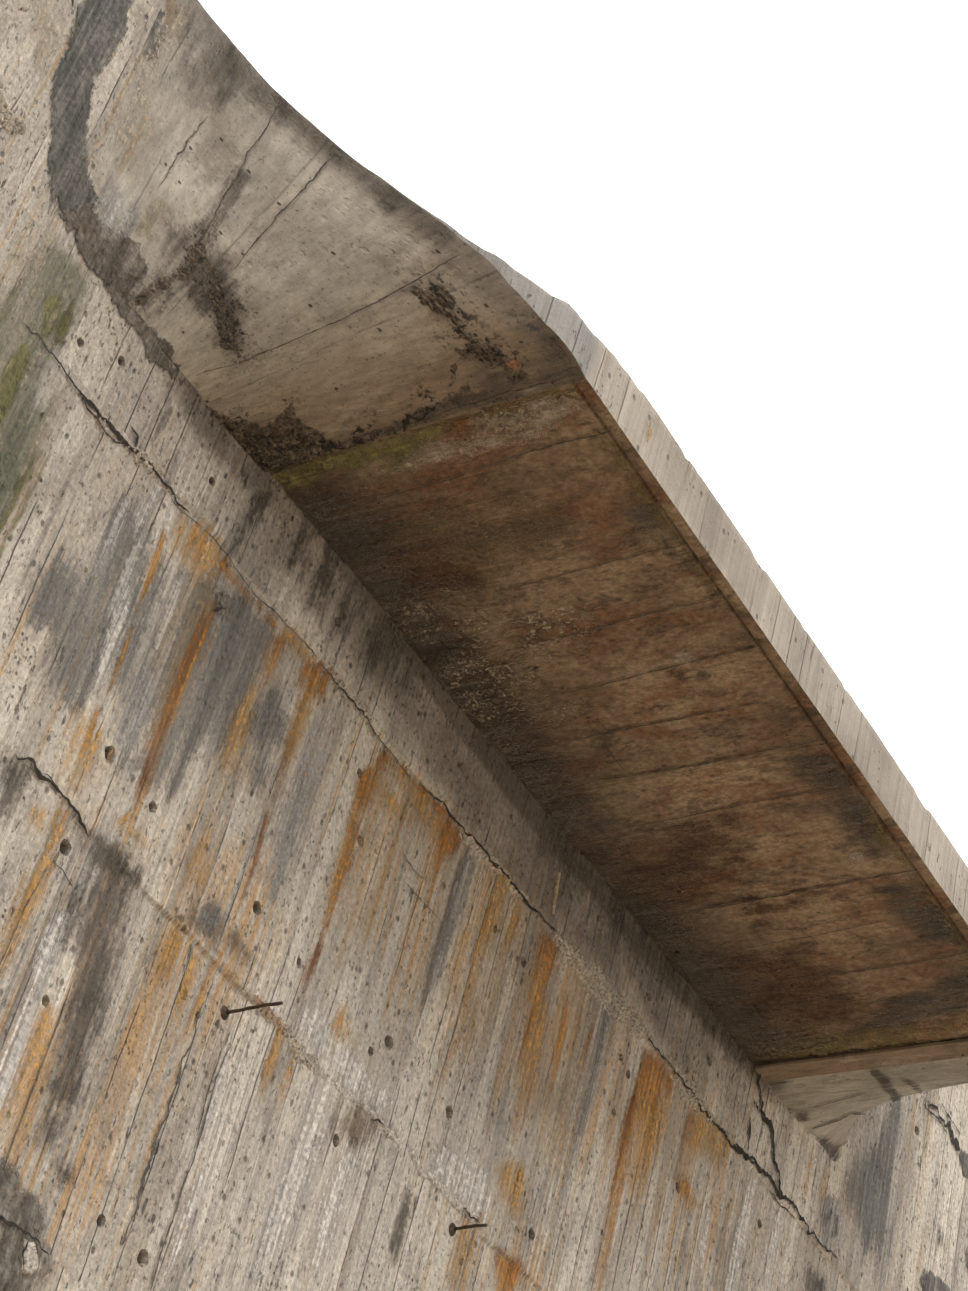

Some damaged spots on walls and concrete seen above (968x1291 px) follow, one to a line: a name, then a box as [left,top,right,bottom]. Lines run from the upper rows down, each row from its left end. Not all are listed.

water stain [125,169,250,350]
water stain [0,376,54,555]
corrosion [143,518,330,756]
crack [15,323,580,931]
corrosion [2,806,69,951]
corrosion [305,746,463,988]
water stain [270,479,968,1060]
crack [122,1007,231,1291]
water stain [524,935,653,1154]
corrosion [600,1049,675,1270]
crack [647,1034,838,1259]
crack [812,1113,866,1129]